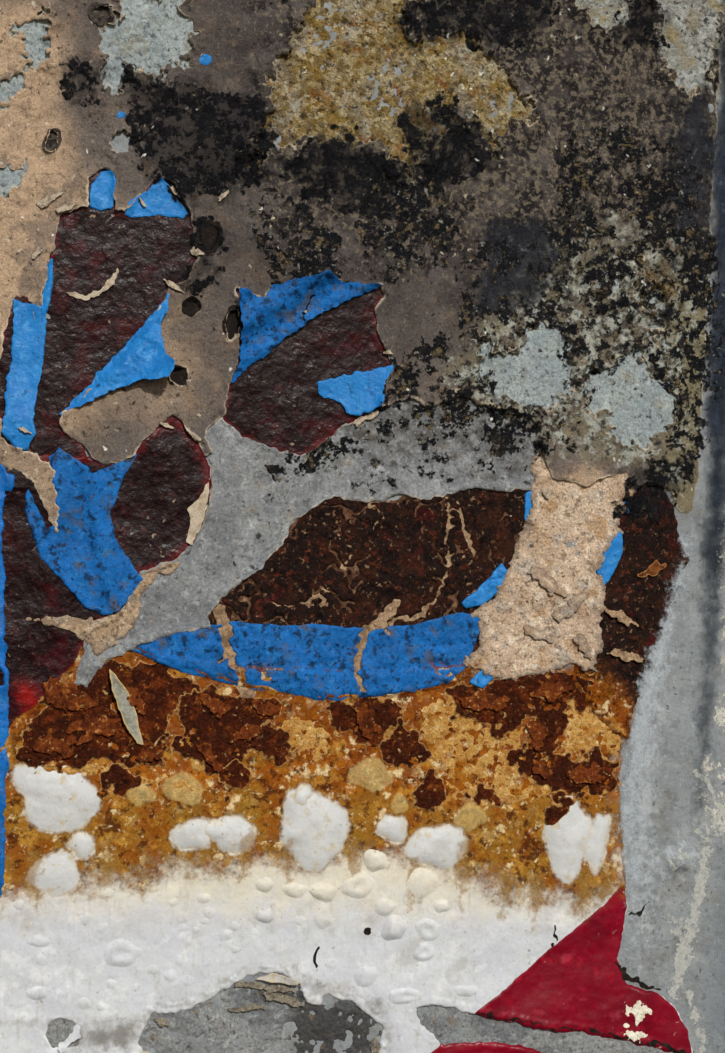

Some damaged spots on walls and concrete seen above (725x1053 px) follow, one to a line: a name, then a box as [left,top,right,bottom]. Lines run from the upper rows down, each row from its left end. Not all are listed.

spalling [88,0,200,95]
damp [389,0,563,56]
damp [614,0,670,48]
spalling [41,128,62,153]
peeling [67,268,119,301]
damp [121,64,725,677]
peeling [186,478,210,545]
peeling [195,488,530,629]
damp [621,536,692,902]
rust [0,643,634,912]
damp [666,746,725,1053]
spalling [138,972,383,1053]